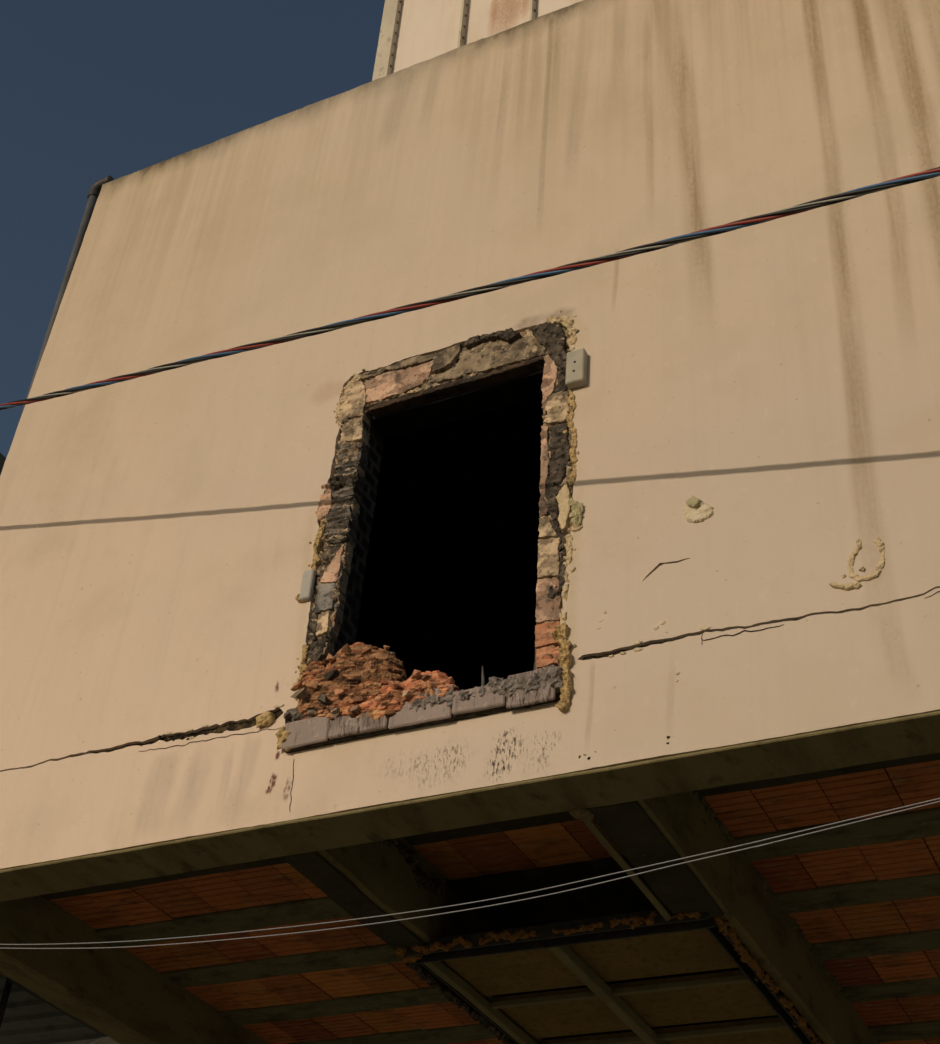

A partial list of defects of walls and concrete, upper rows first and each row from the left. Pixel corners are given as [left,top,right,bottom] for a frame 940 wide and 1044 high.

flaking render [292,310,581,686]
crack [582,619,800,660]
crack [57,703,284,761]